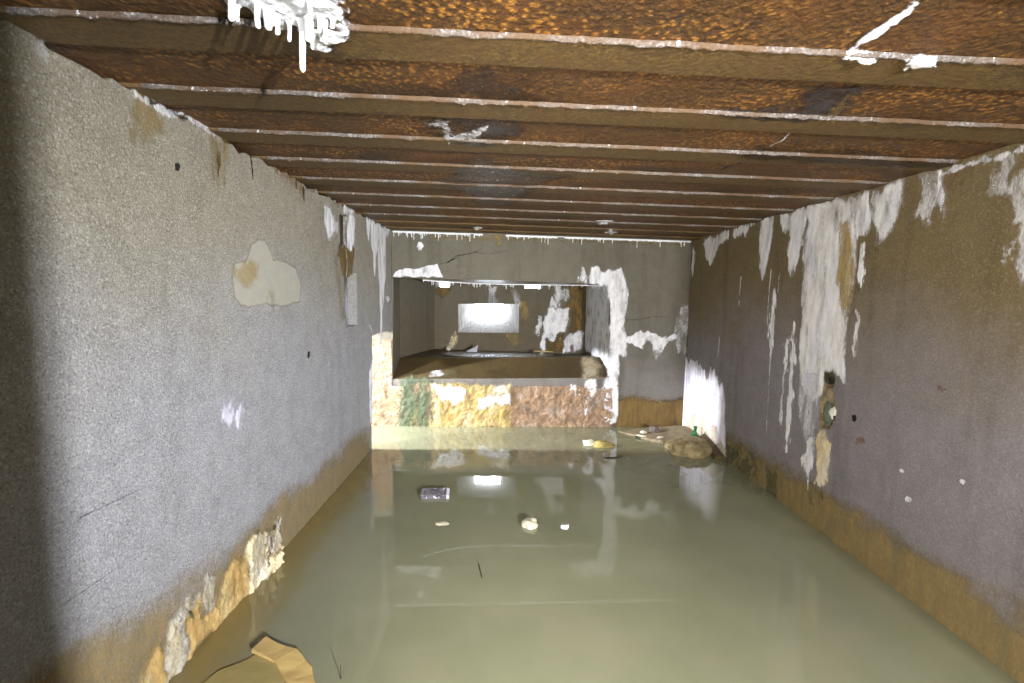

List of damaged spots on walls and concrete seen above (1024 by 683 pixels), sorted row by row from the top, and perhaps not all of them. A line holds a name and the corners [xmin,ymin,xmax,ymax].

leakage [7,0,1024,73]
flaking render [372,339,613,427]
leakage [131,71,1024,683]
spalling [819,370,837,429]